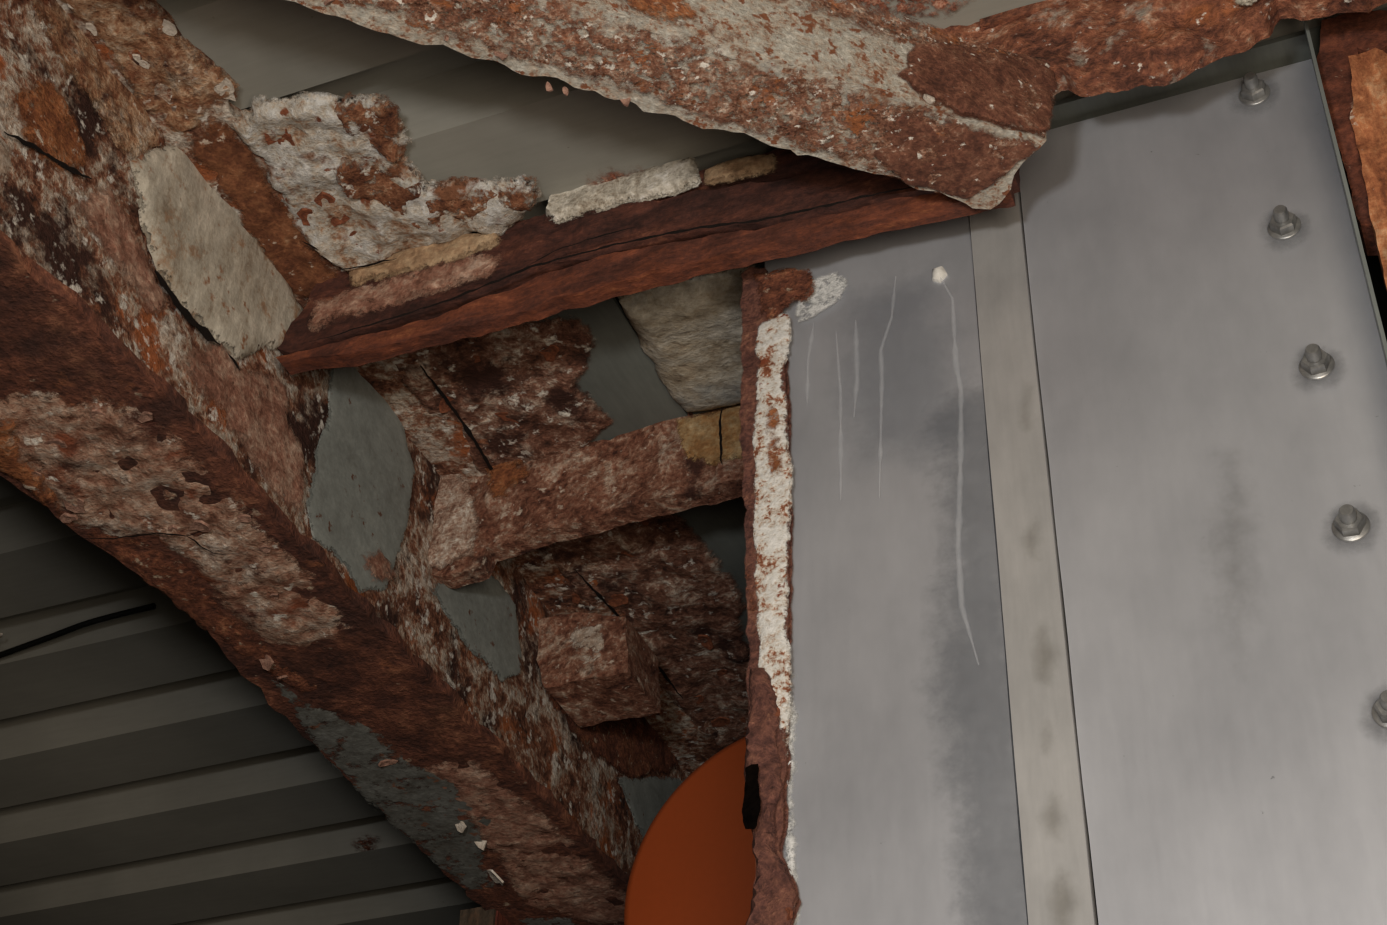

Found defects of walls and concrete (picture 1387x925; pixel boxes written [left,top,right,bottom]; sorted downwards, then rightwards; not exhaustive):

corrosion [15,80,86,172]
corrosion [61,0,337,298]
spalling [231,92,541,271]
corrosion [334,92,540,229]
corrosion [324,0,1058,199]
corrosion [753,268,815,319]
efflorescence [795,273,847,322]
leakage [932,266,948,283]
corrosion [0,391,350,647]
leakage [784,703,797,882]